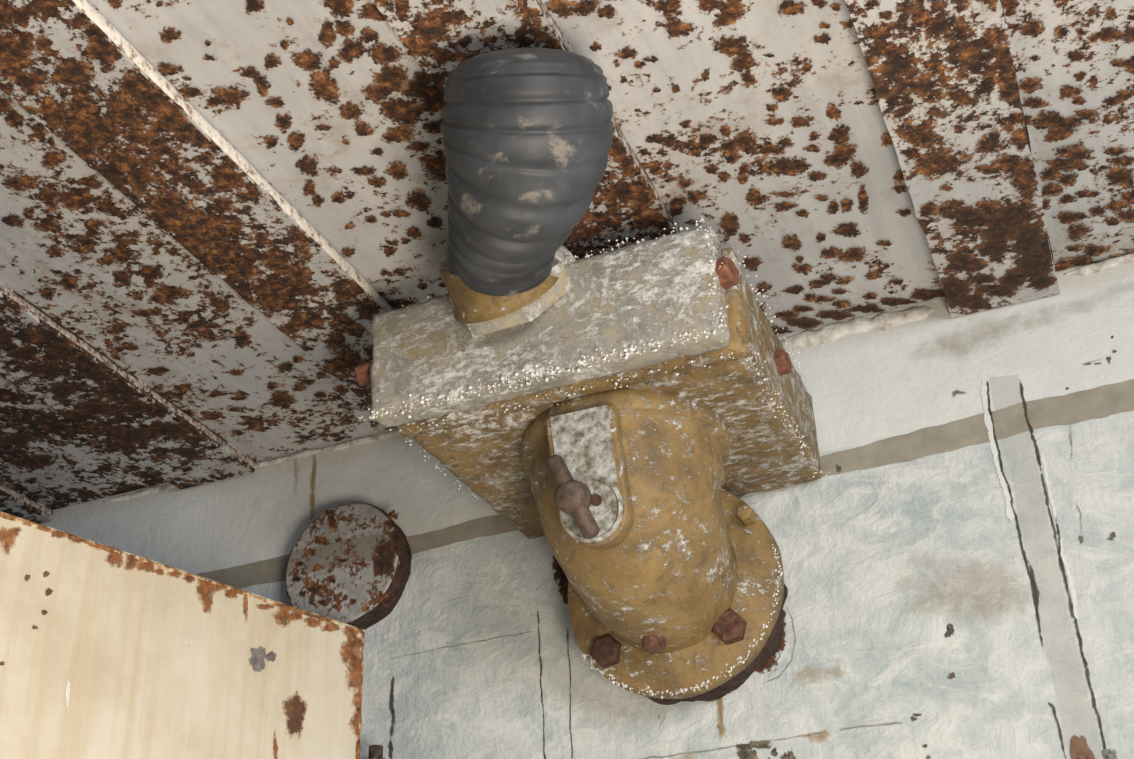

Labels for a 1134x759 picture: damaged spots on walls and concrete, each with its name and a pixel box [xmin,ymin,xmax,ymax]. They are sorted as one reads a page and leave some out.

rust [544,36,563,50]
rust [0,0,472,412]
rust [561,0,1134,387]
rust [0,430,60,472]
rust [0,326,207,463]
rust [359,306,830,501]
rust [0,515,40,554]
rust [52,463,405,759]
crack [981,381,1107,758]
crack [389,612,573,759]
crack [645,701,900,759]
rust [1070,736,1095,759]